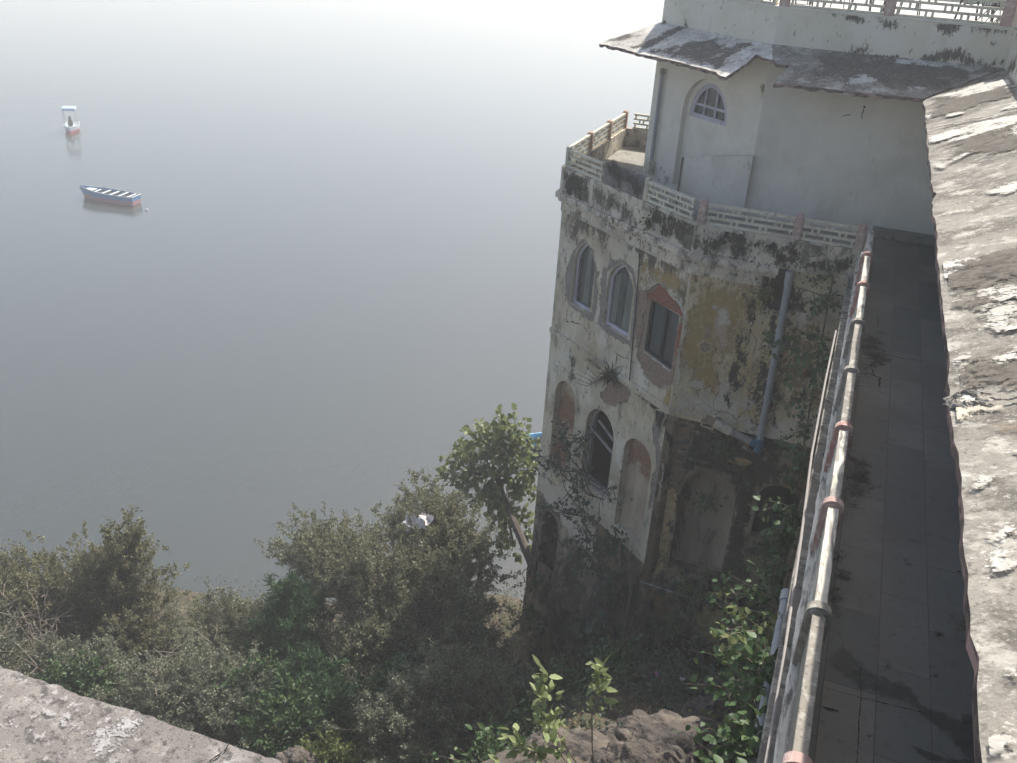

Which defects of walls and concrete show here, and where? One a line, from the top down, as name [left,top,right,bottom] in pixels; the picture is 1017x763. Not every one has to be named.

water stain [609,18,753,69]
water stain [808,23,1017,168]
water stain [562,160,641,222]
water stain [985,181,1017,196]
water stain [649,207,856,276]
water stain [943,248,1017,390]
water stain [566,214,815,655]
spalling [636,281,760,576]
crack [949,390,1017,407]